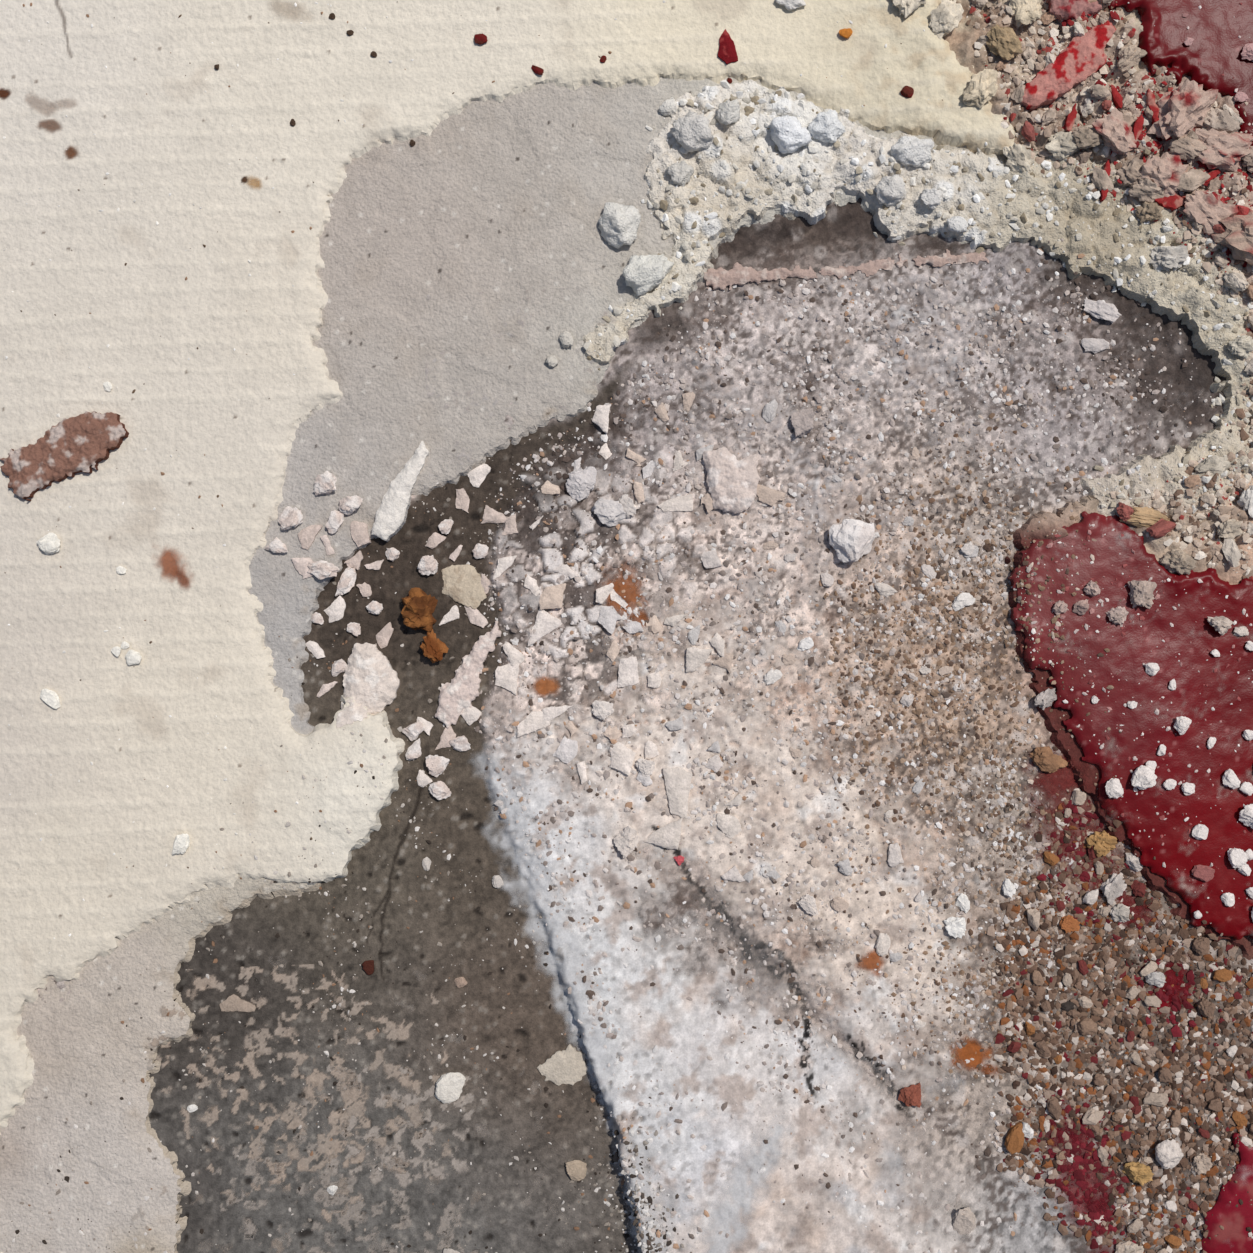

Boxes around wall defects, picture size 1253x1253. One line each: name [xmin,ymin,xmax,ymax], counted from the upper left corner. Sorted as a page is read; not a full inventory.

peeling [900,86,914,98]
spalling [943,0,1191,165]
peeling [248,29,824,735]
spalling [1004,496,1101,608]
spalling [1127,471,1253,585]
spalling [1015,631,1253,960]
crack [652,826,815,1095]
peeling [0,875,322,1253]
spalling [435,1072,466,1103]
spalling [537,1044,587,1086]
crack [847,1035,914,1118]
peeling [1201,1132,1253,1253]